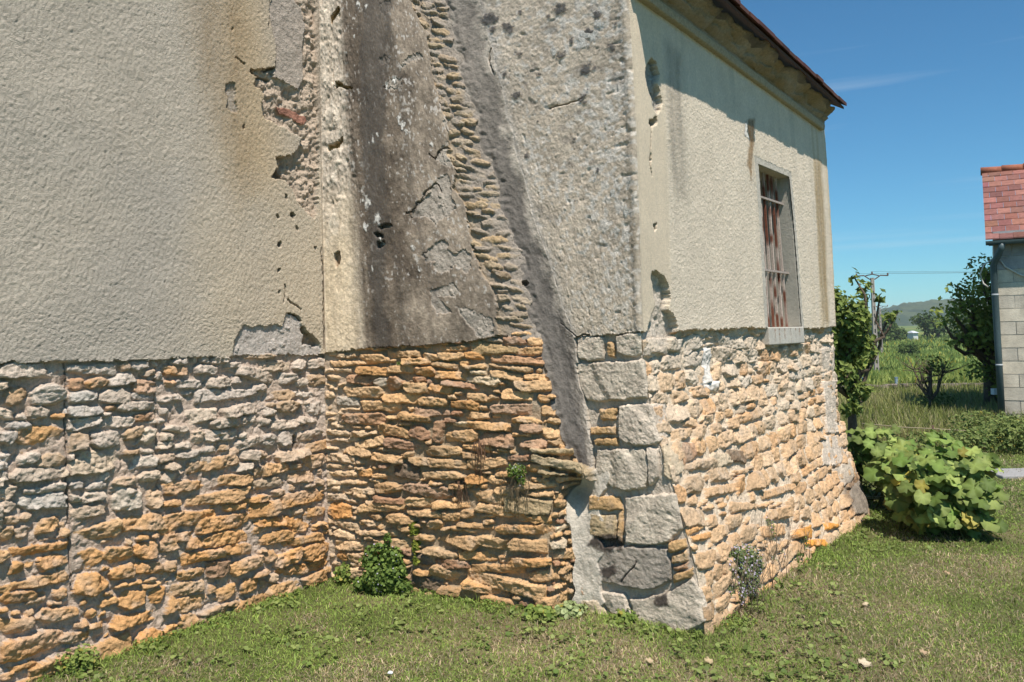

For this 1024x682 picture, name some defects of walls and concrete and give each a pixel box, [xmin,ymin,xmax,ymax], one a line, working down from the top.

spalling [225,81,245,128]
spalling [249,0,343,230]
spalling [645,58,663,126]
damp [361,0,392,345]
crack [406,146,451,214]
peeling [411,119,457,224]
spalling [233,312,322,356]
peeling [422,239,495,338]
spalling [642,270,679,338]